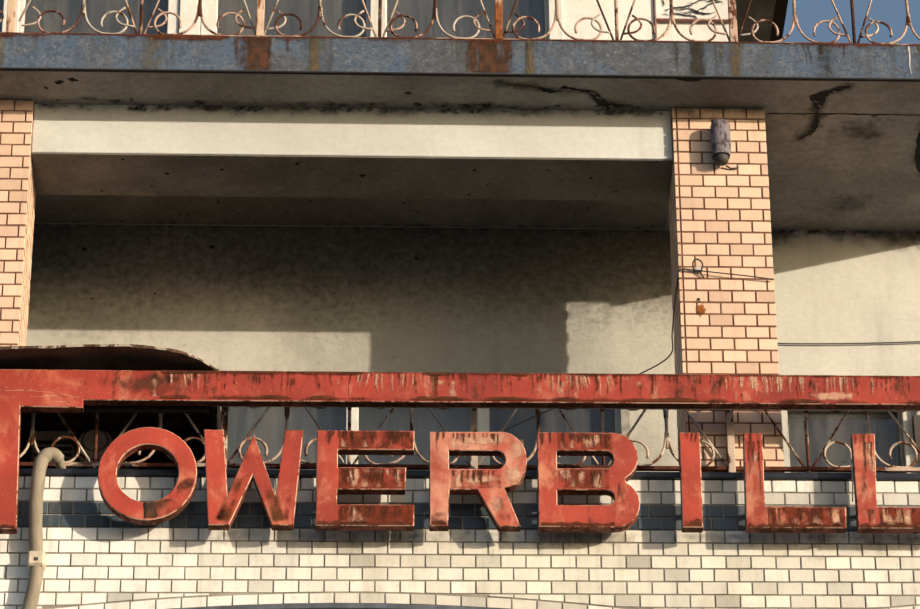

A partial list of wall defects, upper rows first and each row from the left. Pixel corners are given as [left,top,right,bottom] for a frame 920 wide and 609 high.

rust [127,35,307,70]
rust [455,39,512,73]
leakage [110,99,171,111]
leakage [233,102,422,112]
leakage [440,103,502,113]
crack [497,81,623,110]
crack [767,84,920,140]
leakage [771,230,920,243]